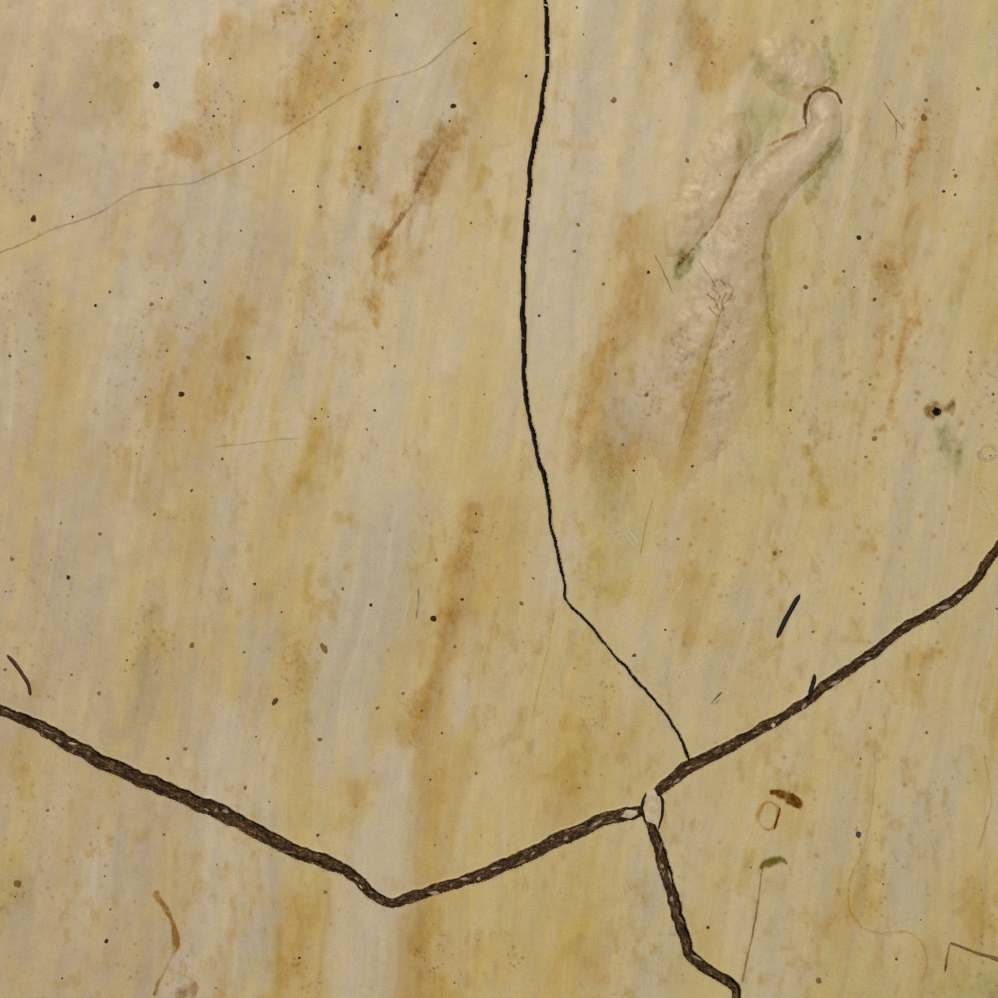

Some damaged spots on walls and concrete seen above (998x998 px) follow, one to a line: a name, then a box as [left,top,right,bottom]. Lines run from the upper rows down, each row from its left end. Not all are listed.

crack [518,0,998,830]
crack [0,703,743,998]
rust [770,790,802,829]
crack [945,942,998,971]